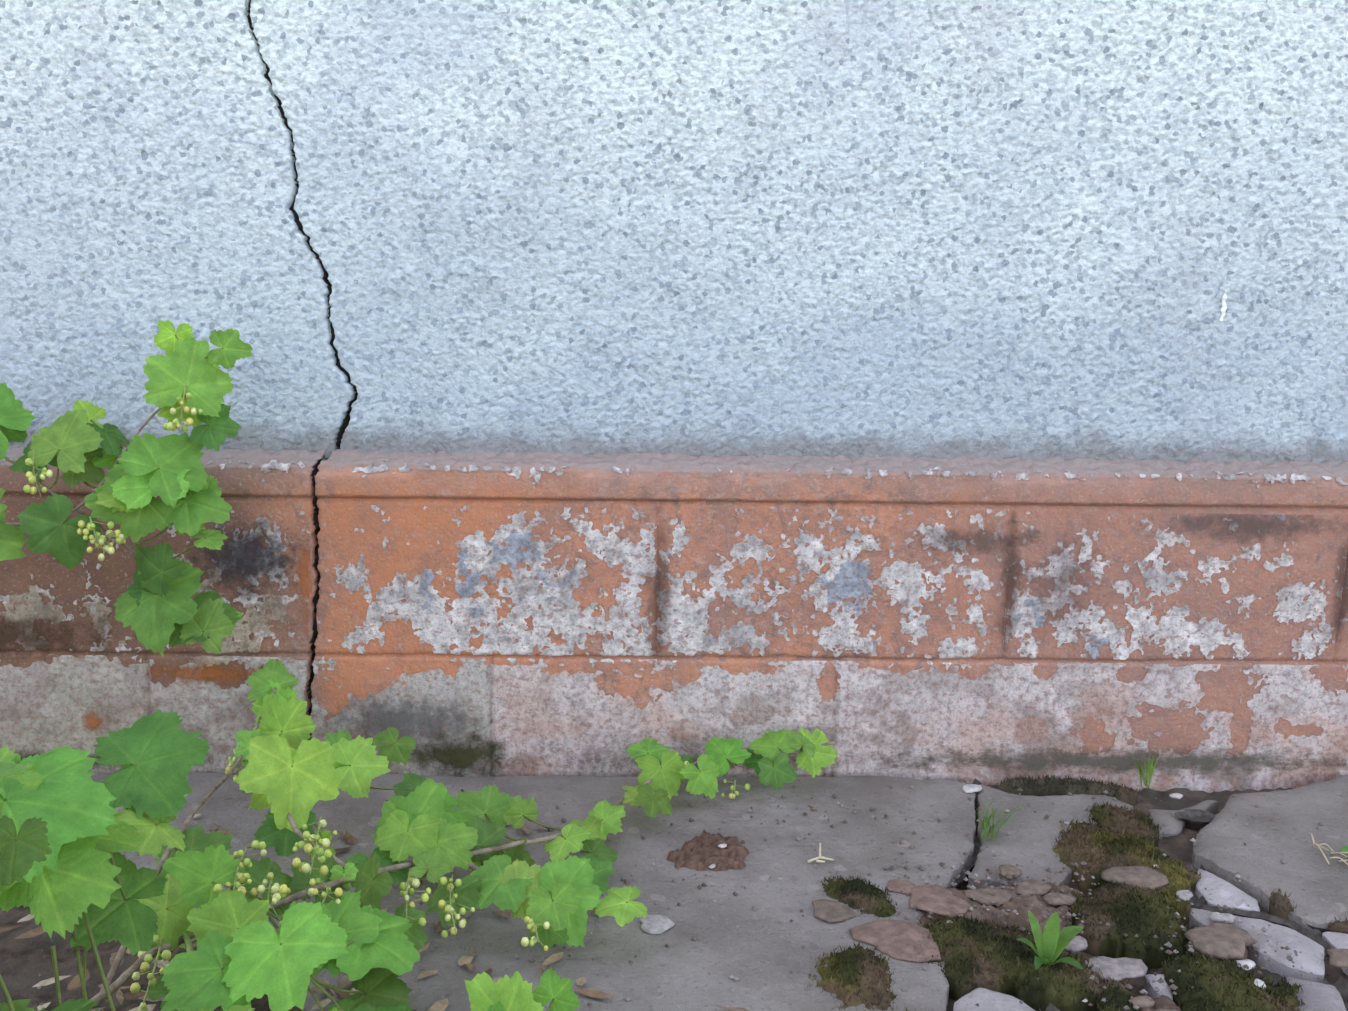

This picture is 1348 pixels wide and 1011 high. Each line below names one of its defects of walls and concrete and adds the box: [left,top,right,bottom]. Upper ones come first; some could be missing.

crack [247,0,358,740]
peeling [0,505,1348,793]